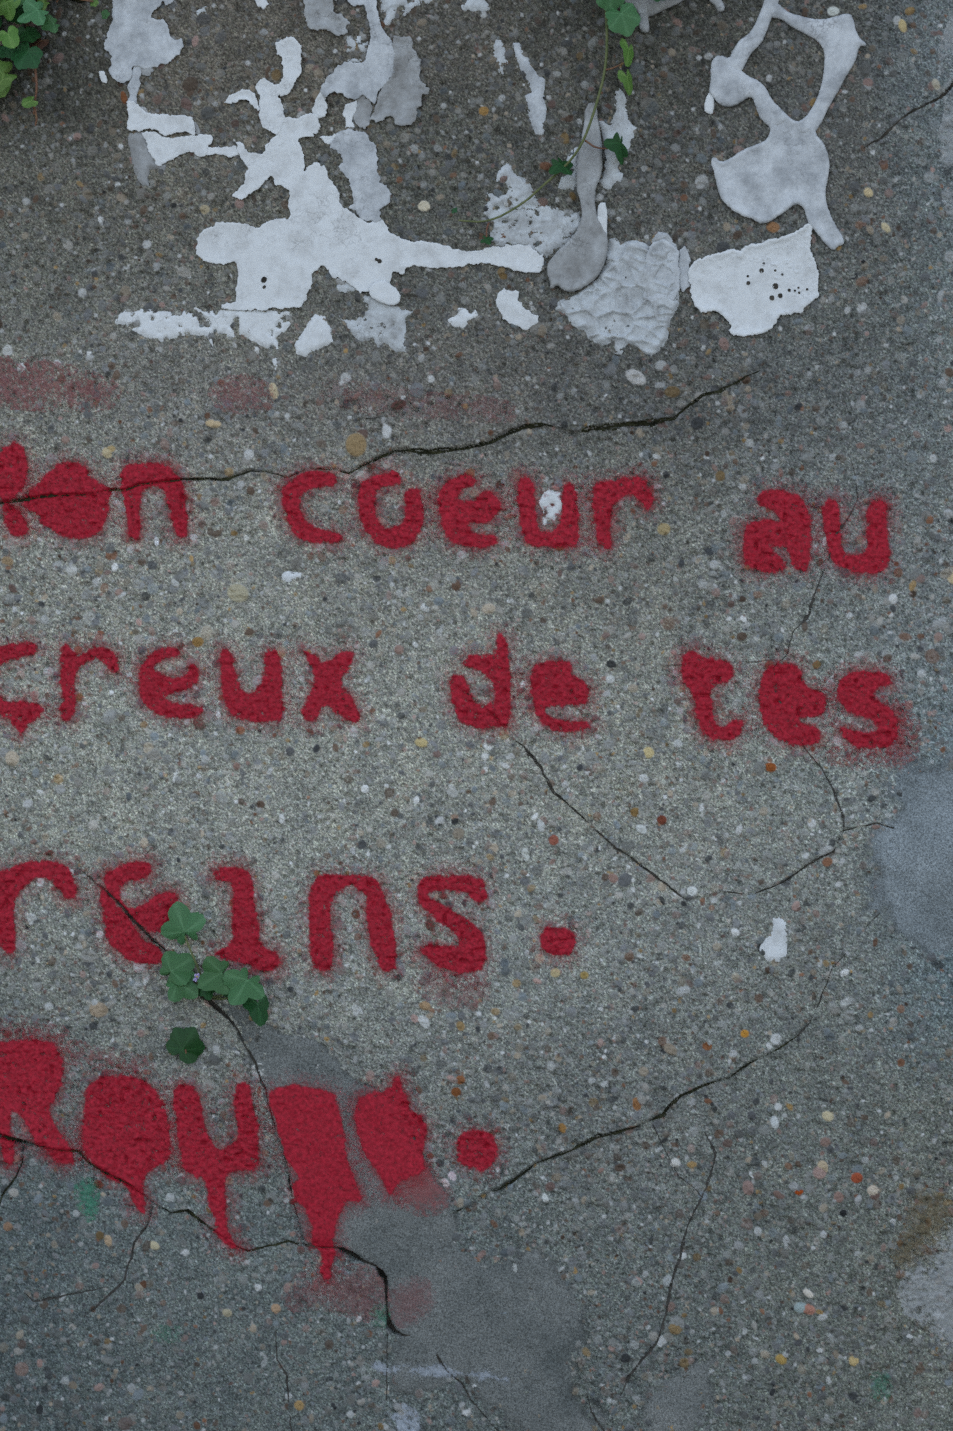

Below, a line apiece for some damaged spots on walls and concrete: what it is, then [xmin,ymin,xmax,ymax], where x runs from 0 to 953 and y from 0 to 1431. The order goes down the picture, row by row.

peeling [99,0,866,370]
crack [864,82,953,148]
crack [0,370,760,504]
crack [80,869,166,952]
crack [515,740,687,900]
crack [727,459,894,895]
crack [0,981,499,1431]
crack [456,954,845,1431]